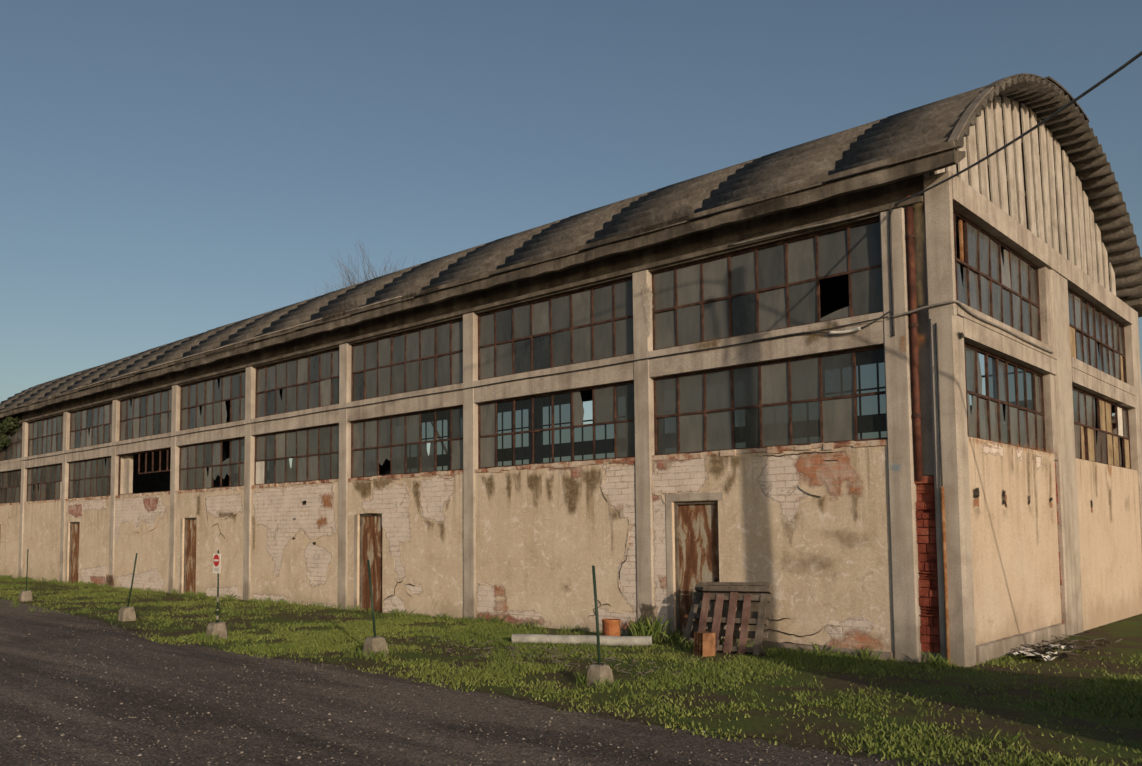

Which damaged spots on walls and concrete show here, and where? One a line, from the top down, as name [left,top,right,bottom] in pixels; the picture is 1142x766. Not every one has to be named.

leakage [528,470,600,512]
flaking render [757,450,861,522]
flaking render [66,496,166,546]
flaking render [205,483,336,587]
flaking render [362,474,455,614]
flaking render [592,456,708,635]
flaking render [205,586,332,607]
flaking render [476,582,544,625]
crack [763,618,825,646]